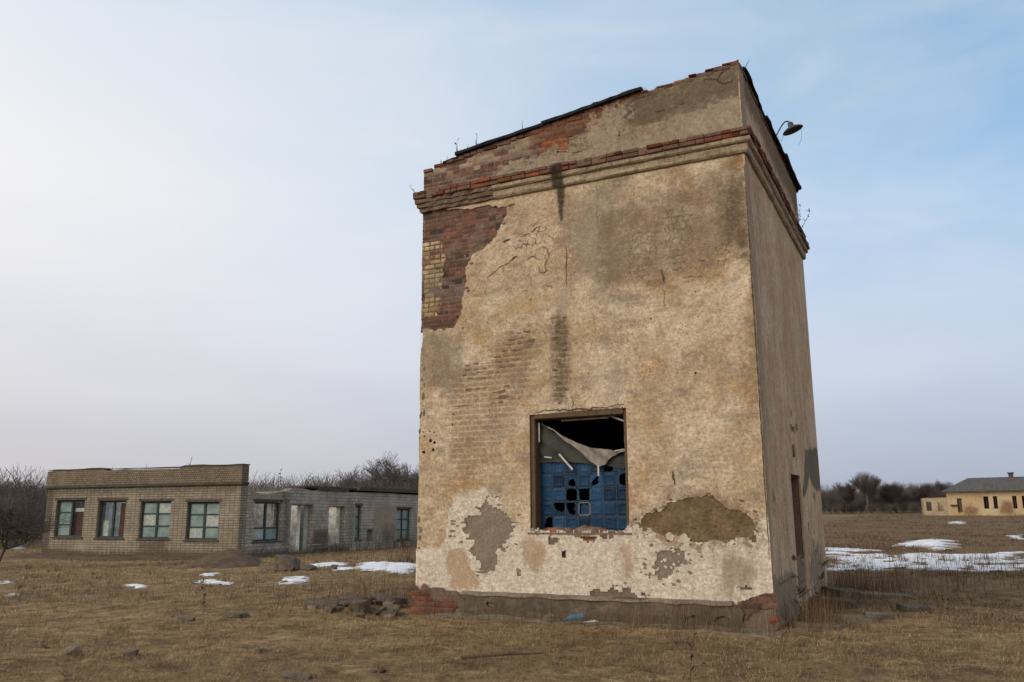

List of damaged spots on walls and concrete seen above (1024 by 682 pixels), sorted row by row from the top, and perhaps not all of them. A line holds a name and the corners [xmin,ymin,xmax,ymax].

flaking render [424,60,740,191]
water stain [529,62,798,220]
spalling [421,203,515,333]
crack [486,225,574,291]
peeling [411,487,781,623]